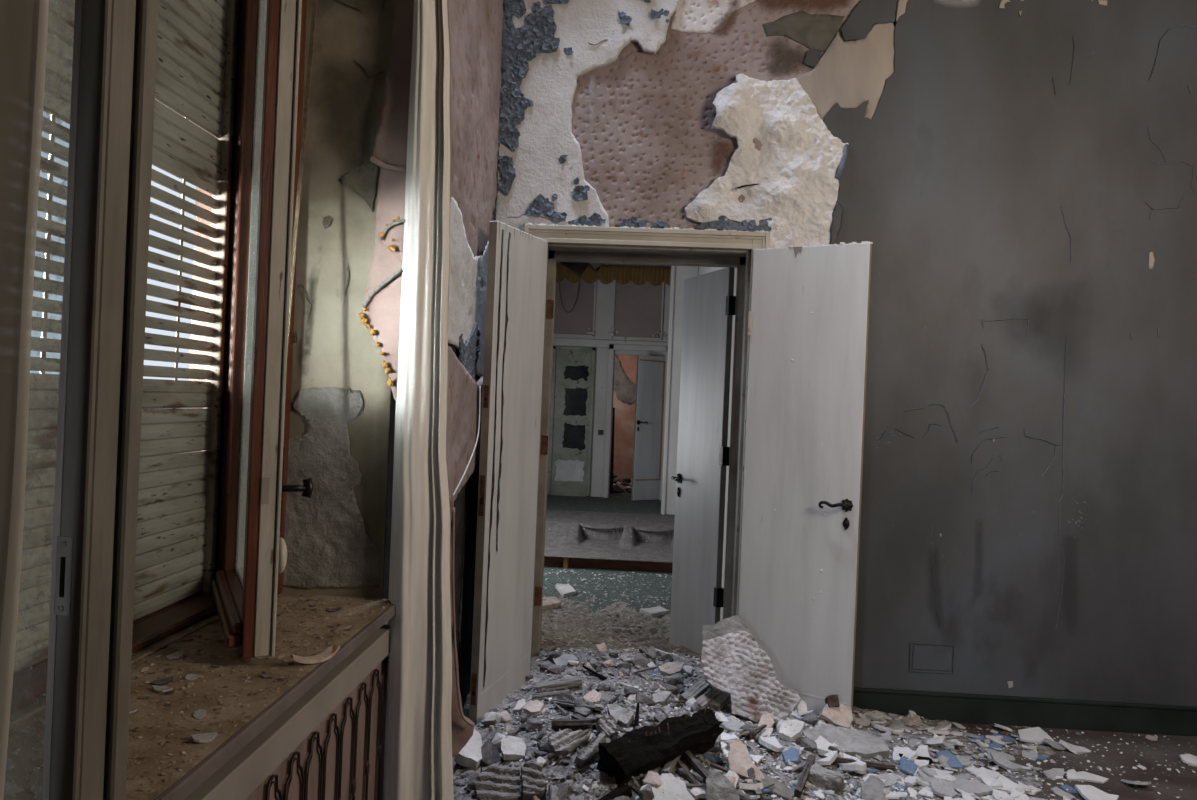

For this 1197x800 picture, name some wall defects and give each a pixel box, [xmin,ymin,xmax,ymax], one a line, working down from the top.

spalling [446,0,908,708]
crack [880,318,1056,493]